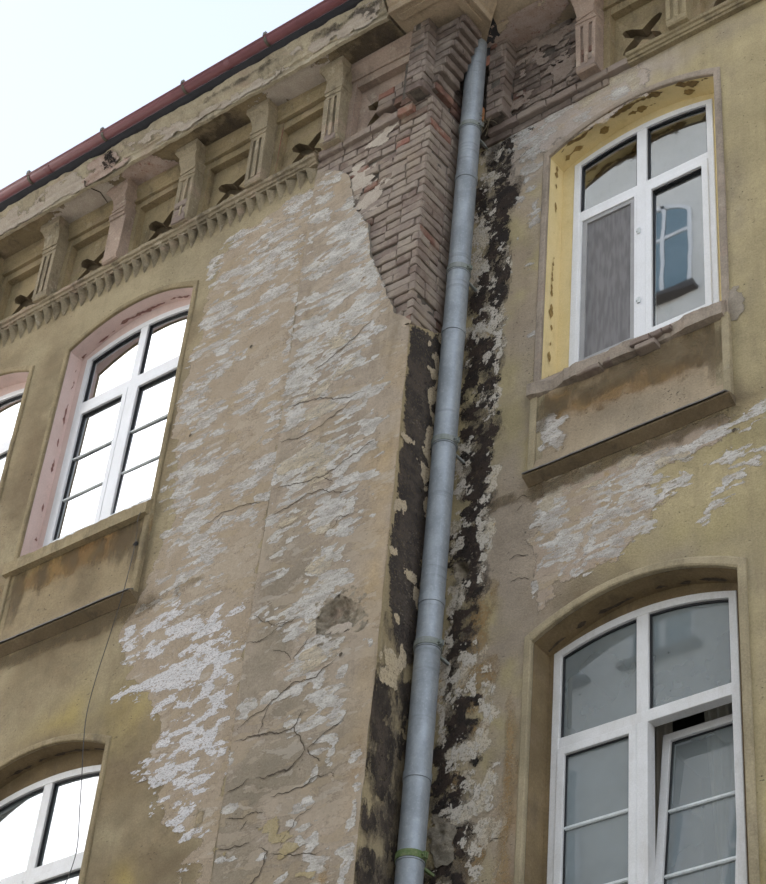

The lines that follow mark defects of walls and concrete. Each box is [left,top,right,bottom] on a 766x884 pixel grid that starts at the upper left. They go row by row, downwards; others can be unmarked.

flaking render [675,78,708,95]
crack [250,615,308,660]
crack [205,441,372,525]
crack [280,391,363,442]
peeling [118,0,662,884]
leakage [354,326,441,884]
leakage [423,127,534,884]
leakage [528,413,724,500]
peeling [527,399,766,615]
crack [219,656,343,884]